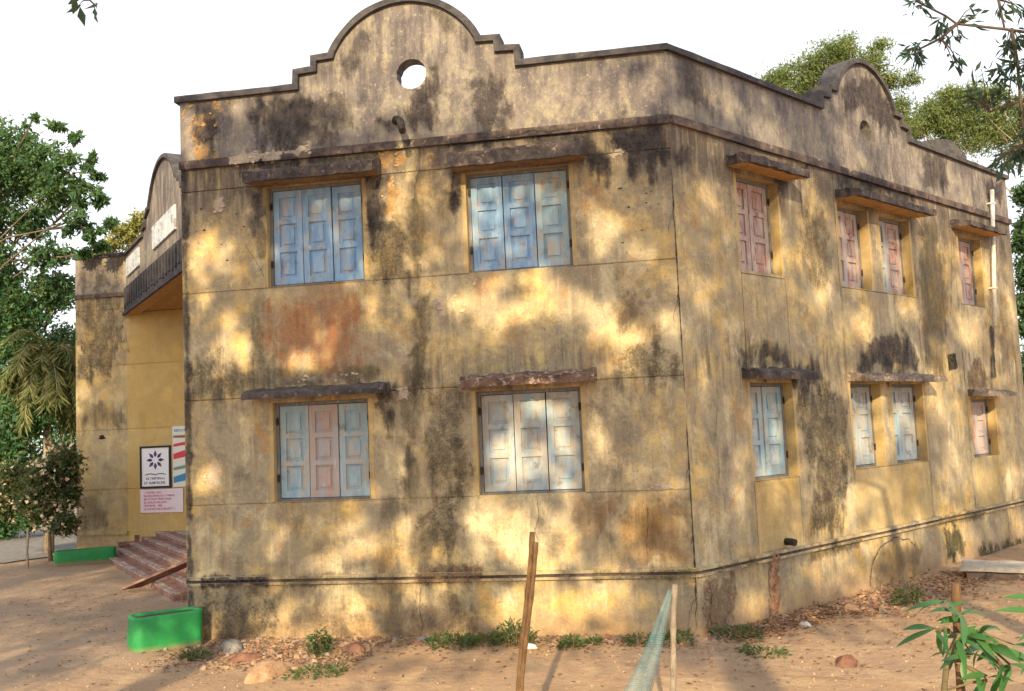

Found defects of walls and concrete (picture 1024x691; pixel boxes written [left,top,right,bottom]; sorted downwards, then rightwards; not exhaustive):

flaking render [182,100,312,167]
leakage [452,73,610,187]
leakage [607,115,670,184]
leakage [366,175,389,246]
leakage [446,168,460,209]
crack [667,167,685,392]
leakage [76,291,125,378]
leakage [375,297,427,447]
leakage [859,333,919,383]